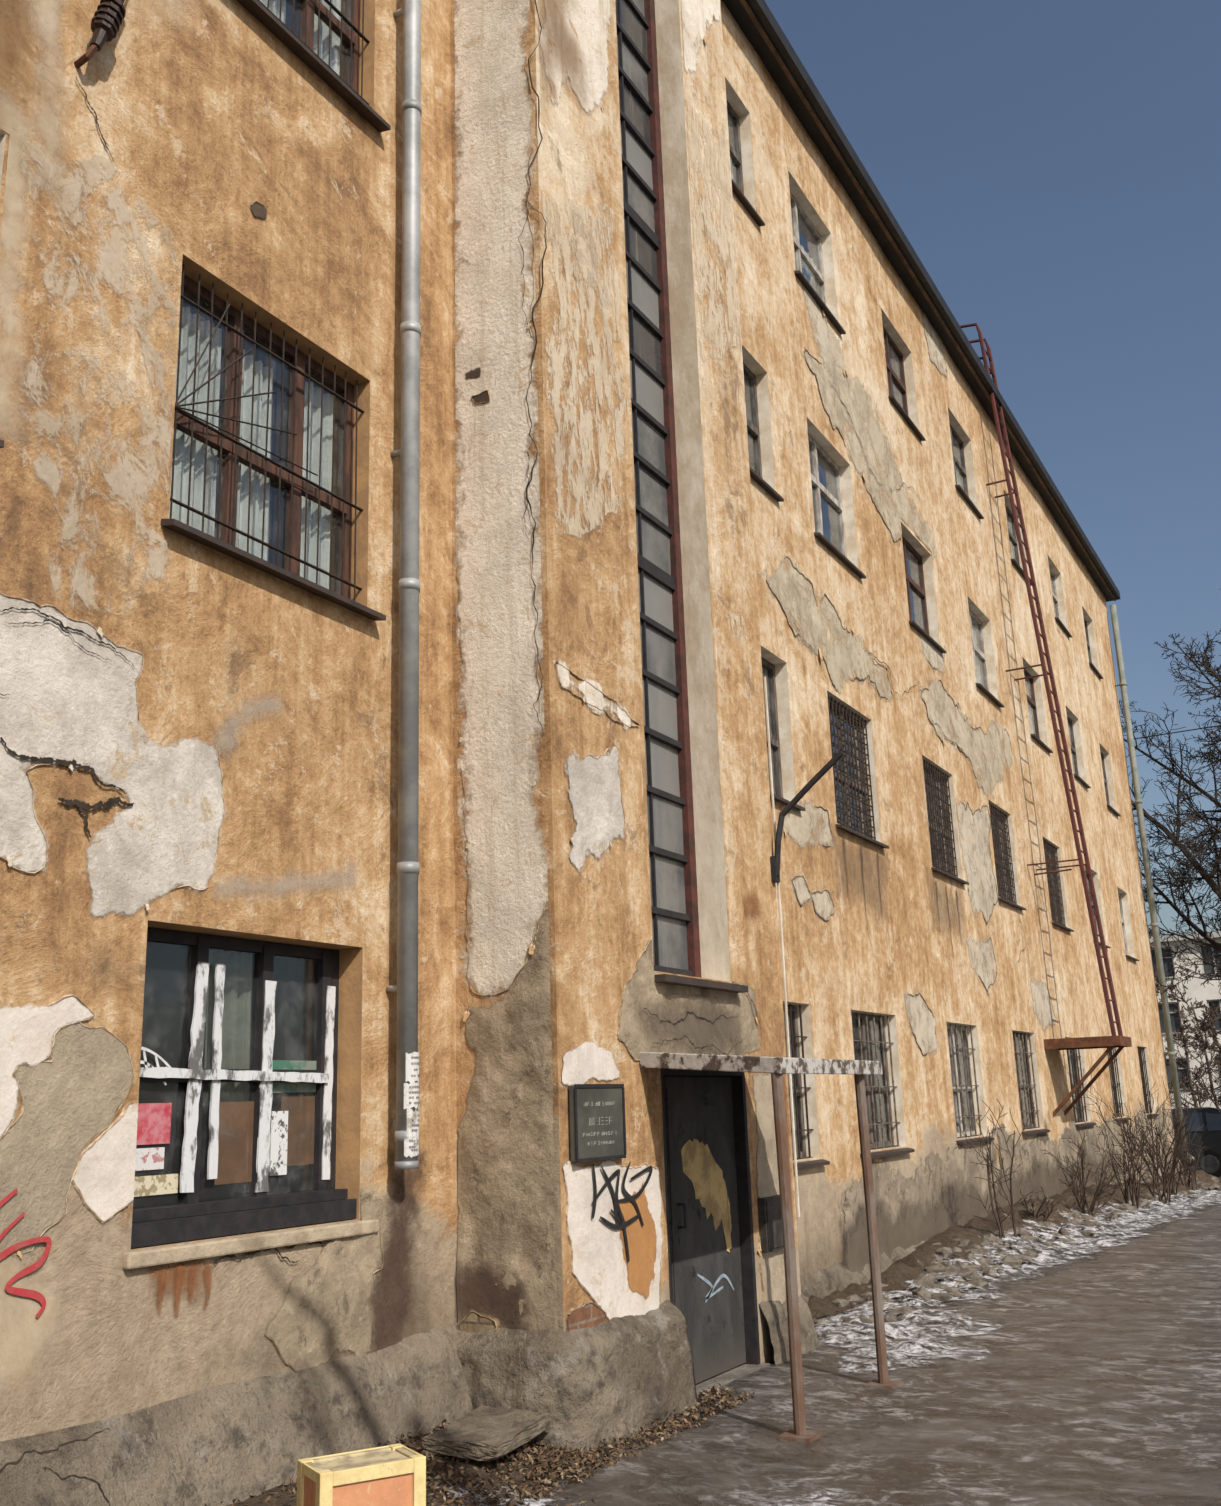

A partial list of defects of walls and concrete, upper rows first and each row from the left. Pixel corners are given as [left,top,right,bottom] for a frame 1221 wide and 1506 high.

peeling [0,139,225,916]
crack [518,0,547,736]
peeling [803,285,937,565]
peeling [454,0,760,1334]
peeling [919,632,1013,995]
flaking render [0,994,139,1259]
rust [156,1260,212,1316]
water stain [372,1153,423,1352]
water stain [455,1266,527,1330]
flaking render [753,1073,789,1198]
flaking render [757,1236,786,1325]
crack [0,1428,110,1505]